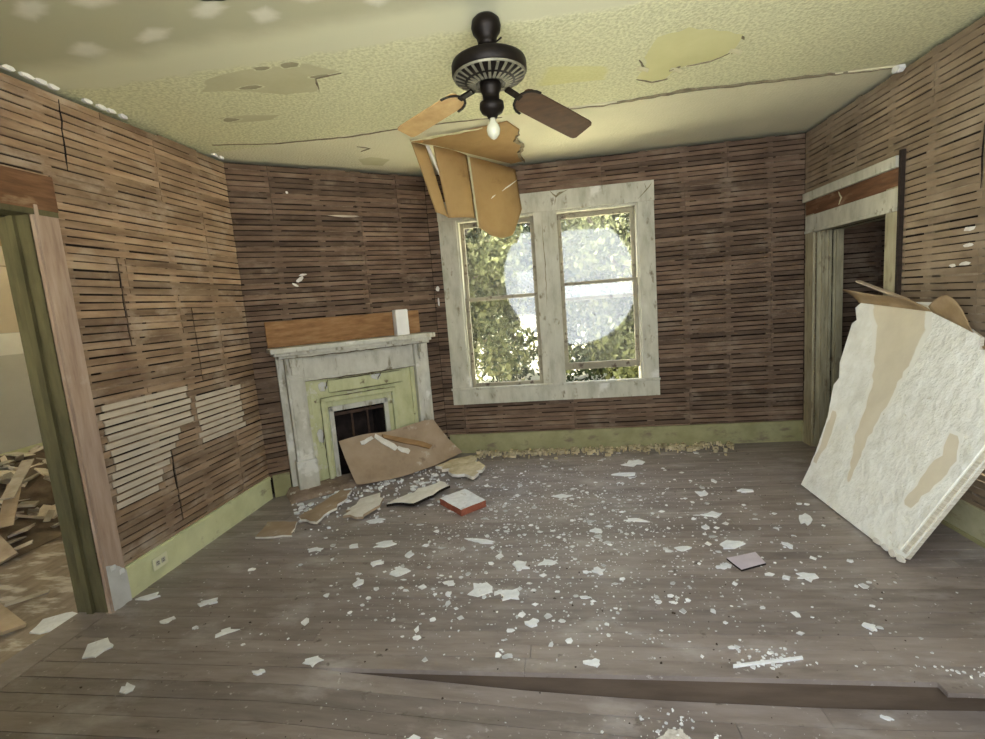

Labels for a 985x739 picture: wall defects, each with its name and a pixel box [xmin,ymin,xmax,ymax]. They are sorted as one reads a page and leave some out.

peeling [196,61,344,96]
peeling [634,25,748,83]
crack [569,67,893,109]
spalling [892,64,906,74]
crack [212,128,398,146]
crack [435,117,502,125]
peeling [845,302,932,485]
peeling [810,408,839,467]
peeling [901,429,964,511]
spalling [873,537,906,563]